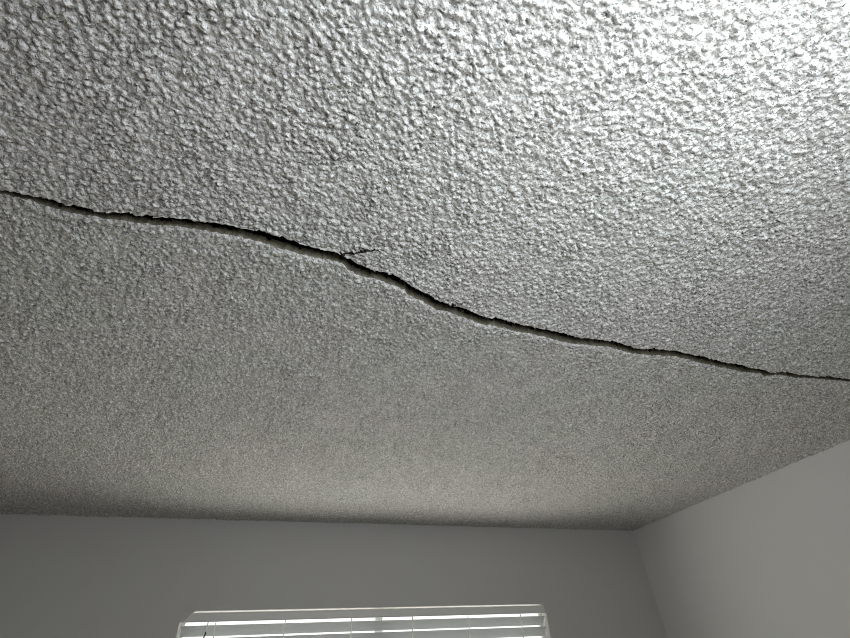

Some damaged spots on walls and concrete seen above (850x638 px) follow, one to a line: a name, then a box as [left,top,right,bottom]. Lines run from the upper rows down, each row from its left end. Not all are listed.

crack [0,190,850,381]